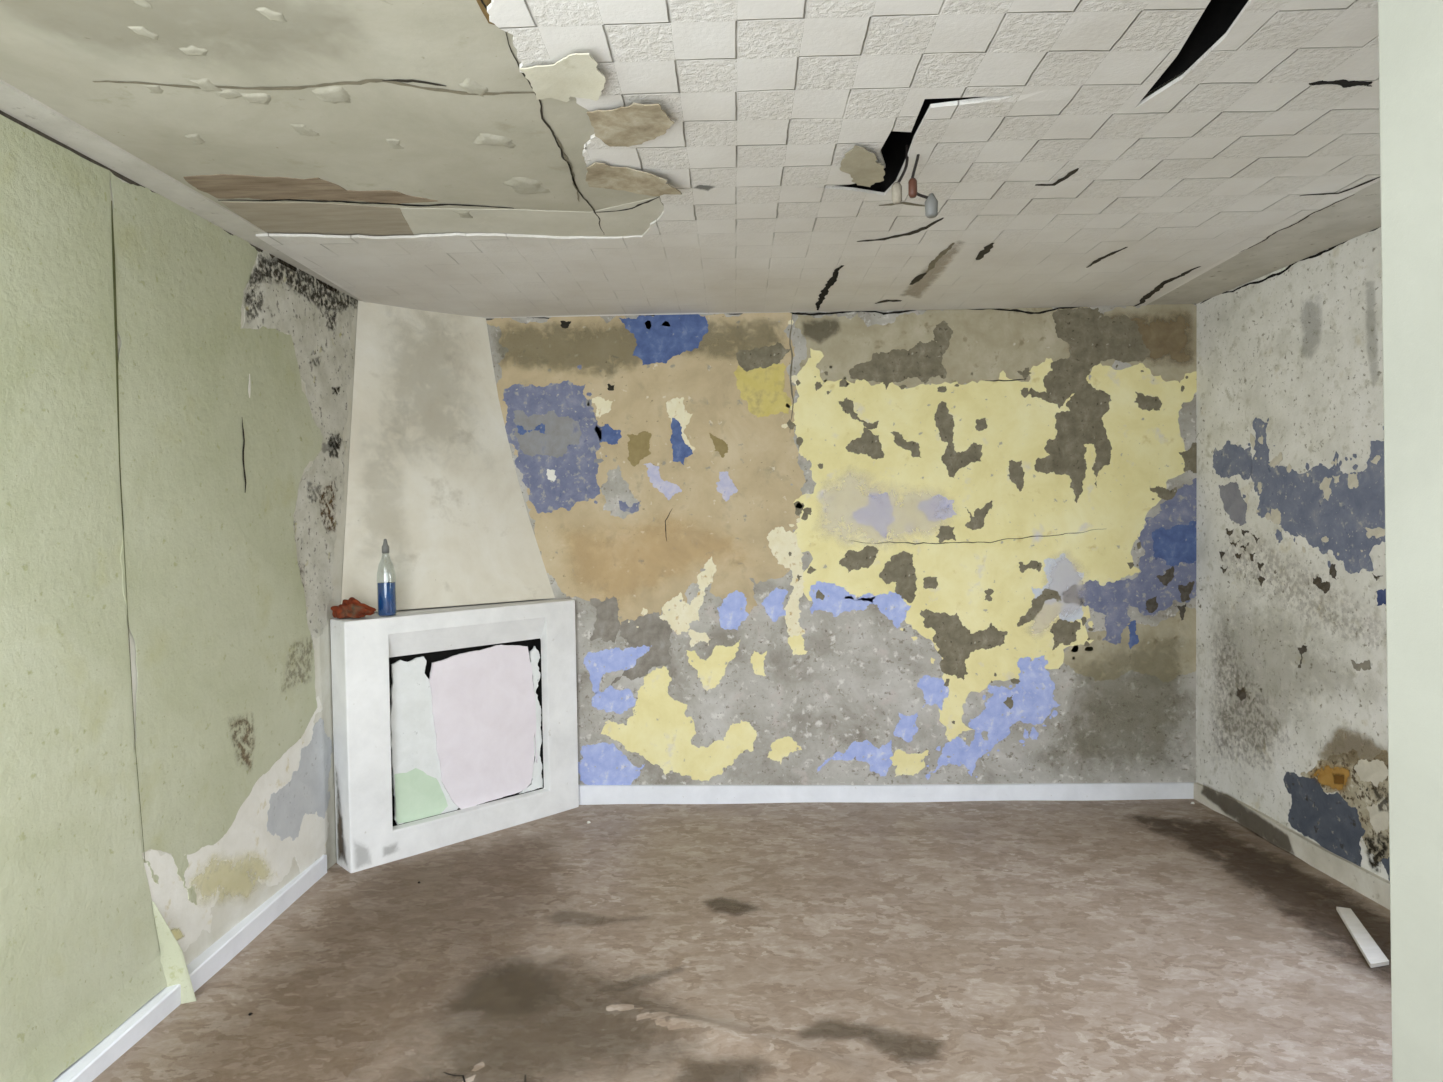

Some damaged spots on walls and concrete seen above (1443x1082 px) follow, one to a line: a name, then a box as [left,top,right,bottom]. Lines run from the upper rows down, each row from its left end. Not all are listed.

crack [93,33,660,233]
peeling [519,53,674,147]
crack [1309,79,1372,88]
damp [246,257,356,330]
peeling [486,304,1197,781]
peeling [1219,528,1265,587]
peeling [1313,564,1337,594]
damp [1322,729,1388,768]
flaking render [143,696,329,952]
damp [1135,786,1391,981]
damp [444,968,654,1082]
damp [804,1022,939,1059]